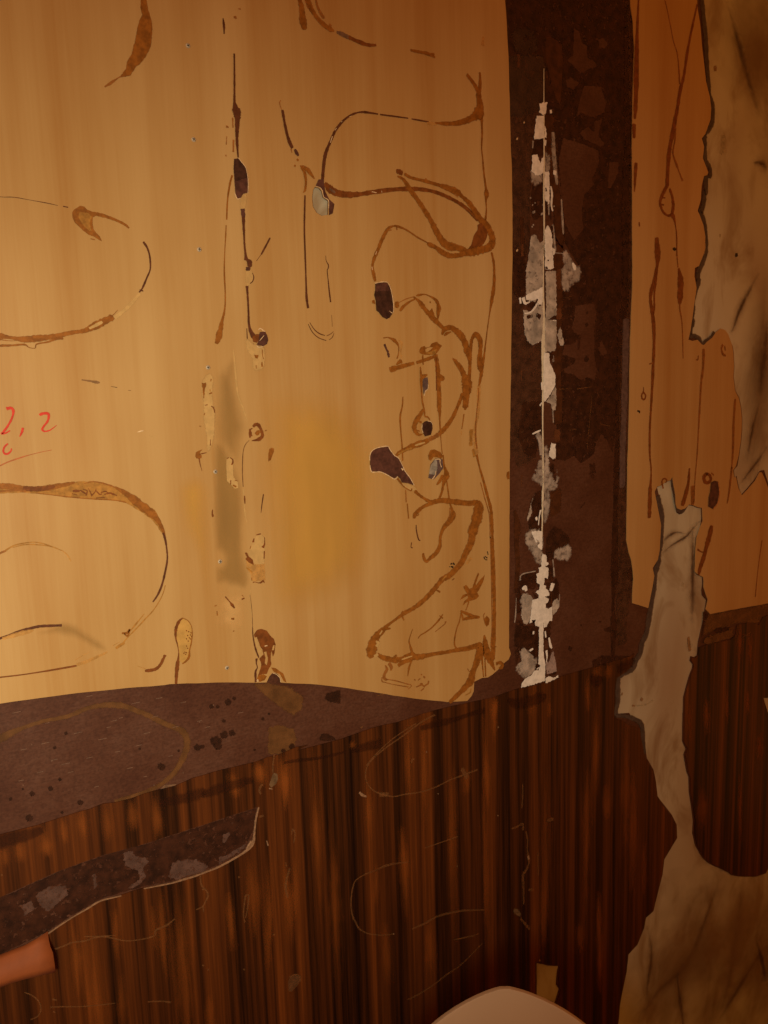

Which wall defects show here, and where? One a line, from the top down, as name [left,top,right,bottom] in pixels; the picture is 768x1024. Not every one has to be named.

crack [223,8,241,158]
crack [480,117,489,219]
crack [0,242,151,349]
spalling [514,95,581,688]
peeling [369,446,417,491]
crack [469,252,497,660]
peeling [708,481,720,510]
crack [0,624,62,639]
crack [0,665,77,678]
crack [145,655,166,672]
peeling [0,807,260,988]